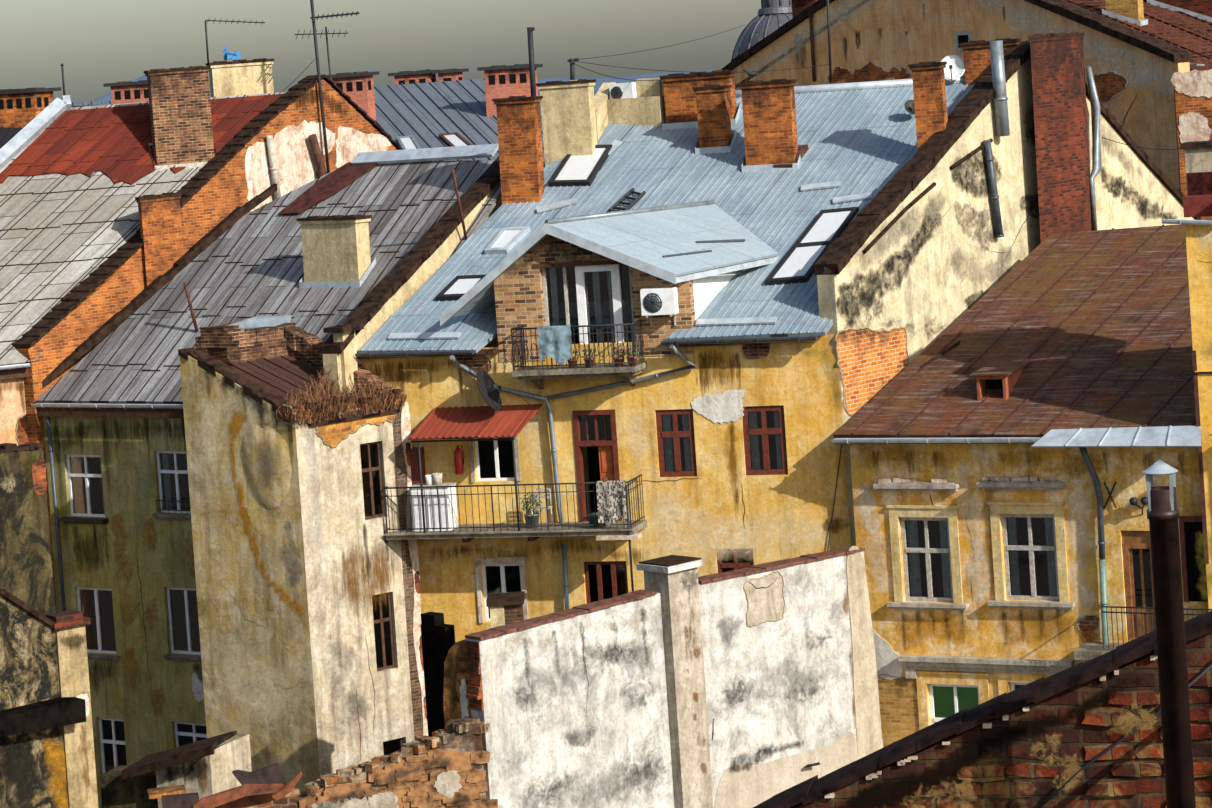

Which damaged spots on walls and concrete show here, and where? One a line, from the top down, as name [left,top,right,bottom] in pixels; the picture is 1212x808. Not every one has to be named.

flaking render [1093,70,1129,104]
peeling [244,120,392,212]
water stain [952,154,1000,248]
water stain [1021,195,1039,218]
water stain [837,204,938,325]
flaking render [835,326,910,417]
water stain [231,403,303,613]
spalling [276,389,428,736]
water stain [730,742,800,771]